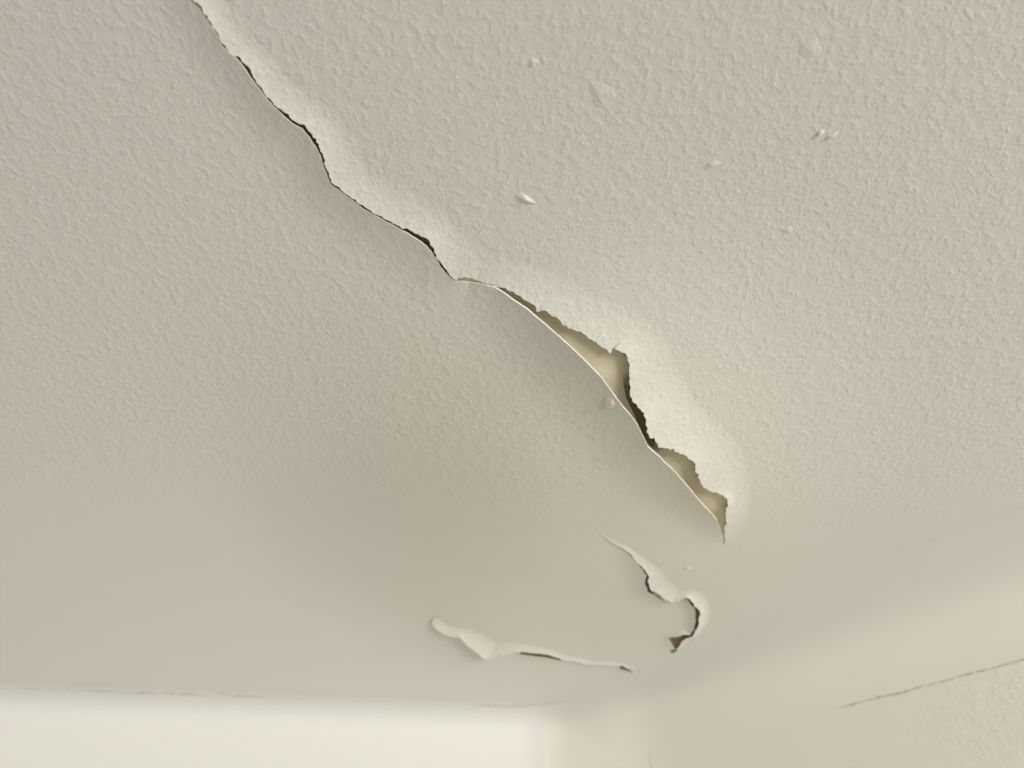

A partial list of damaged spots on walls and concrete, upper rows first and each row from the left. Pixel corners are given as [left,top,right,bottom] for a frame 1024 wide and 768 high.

peeling [449,256,752,550]
peeling [431,617,637,675]